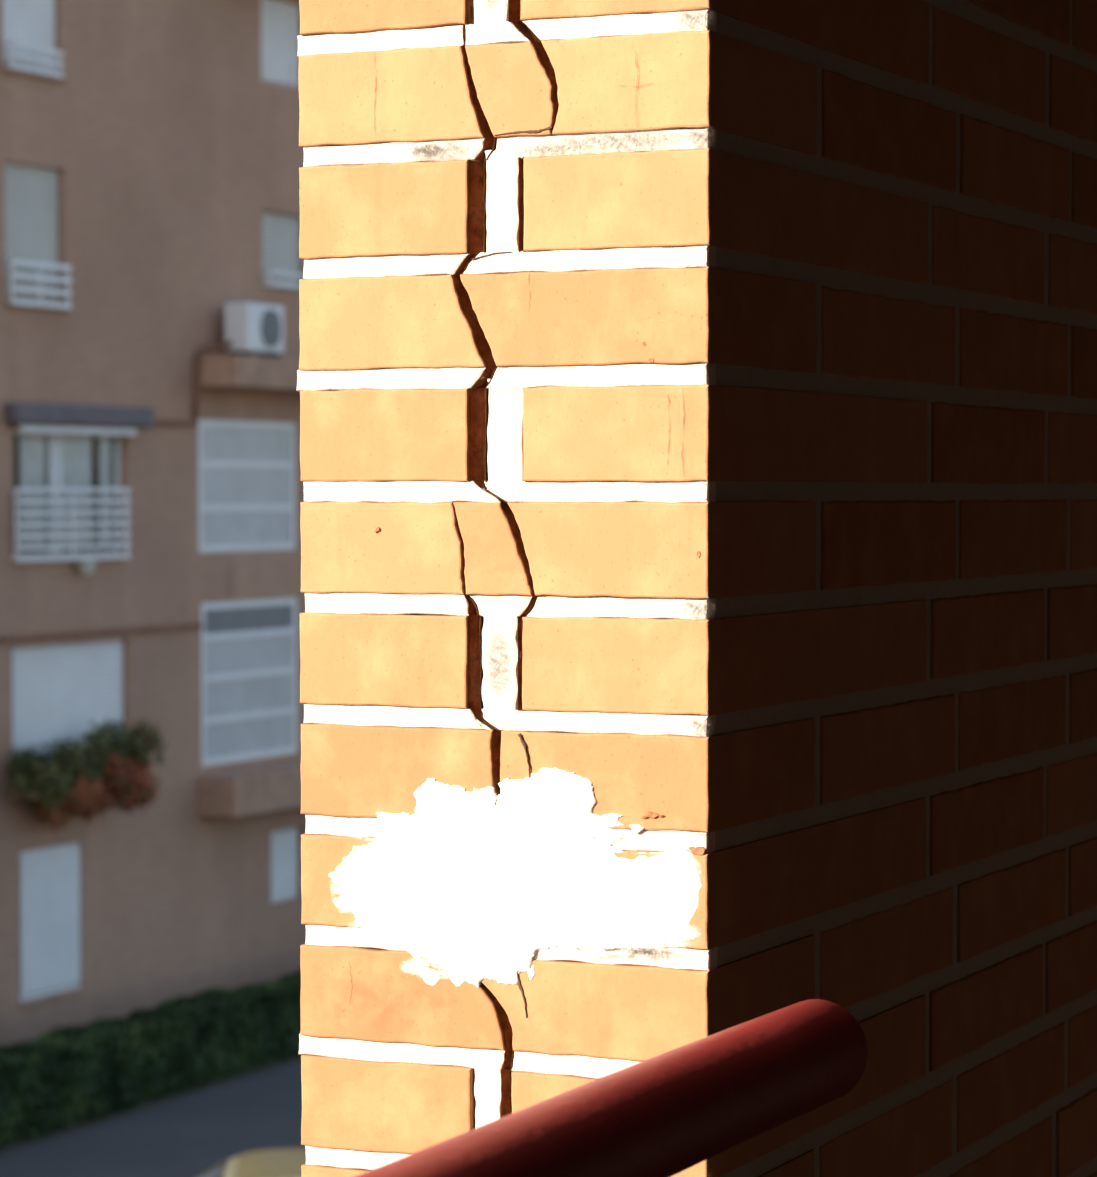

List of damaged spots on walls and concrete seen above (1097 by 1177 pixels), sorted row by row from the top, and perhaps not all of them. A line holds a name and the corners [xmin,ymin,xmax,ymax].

crack [452,0,559,795]
crack [480,970,527,1118]